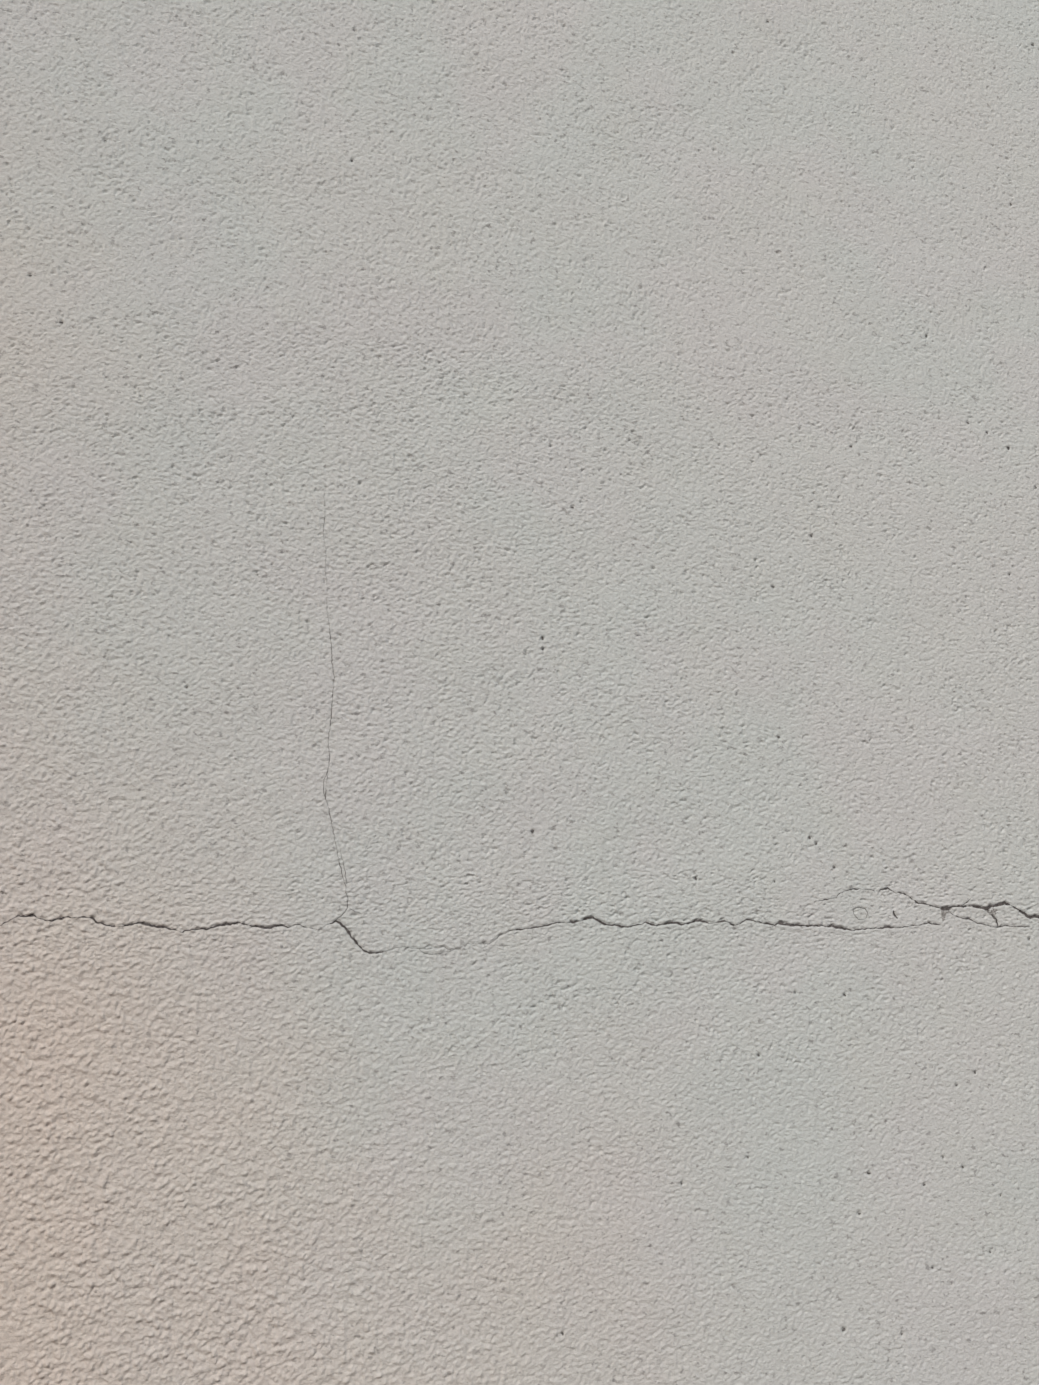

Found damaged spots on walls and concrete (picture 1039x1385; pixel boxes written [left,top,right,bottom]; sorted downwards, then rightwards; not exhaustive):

crack [0,488,1039,955]